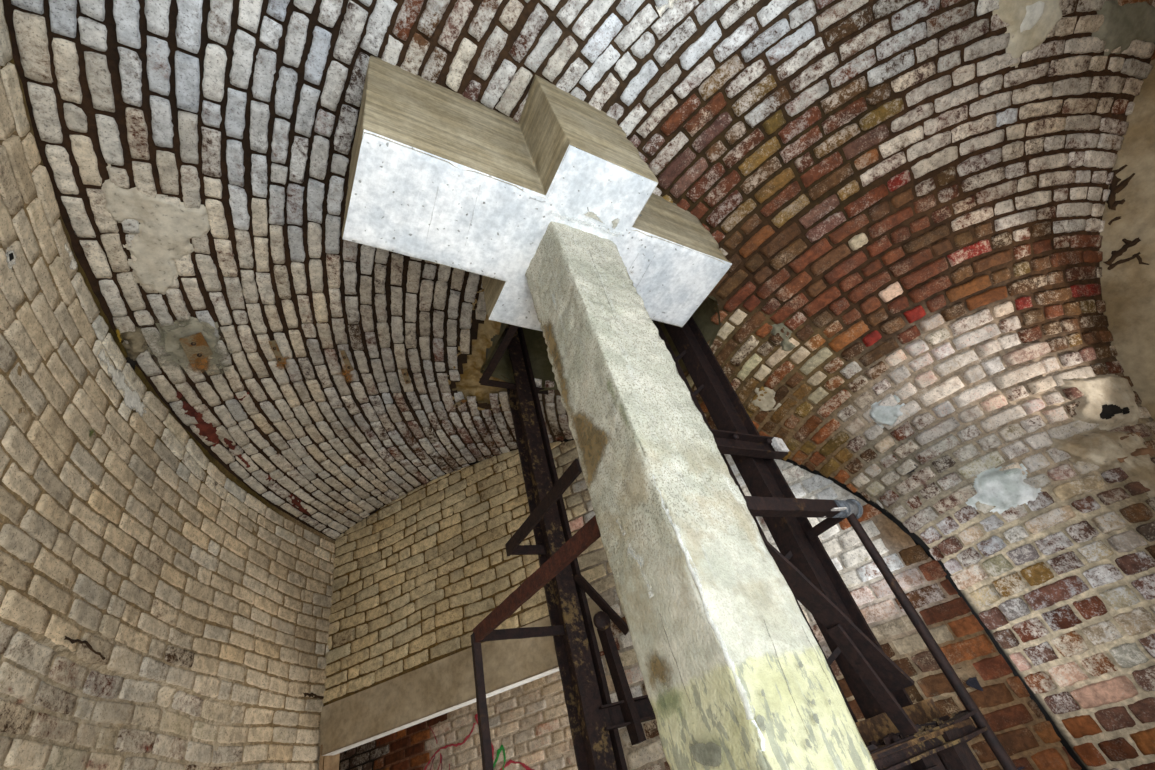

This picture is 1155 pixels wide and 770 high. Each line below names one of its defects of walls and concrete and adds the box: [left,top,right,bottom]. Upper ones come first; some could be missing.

peeling [1020,1,1045,32]
crack [1104,165,1149,270]
water stain [869,395,905,428]
flaking render [1100,404,1130,420]
peeling [176,390,250,468]
peeling [1118,432,1155,463]
peeling [289,494,311,515]
crack [64,636,105,660]